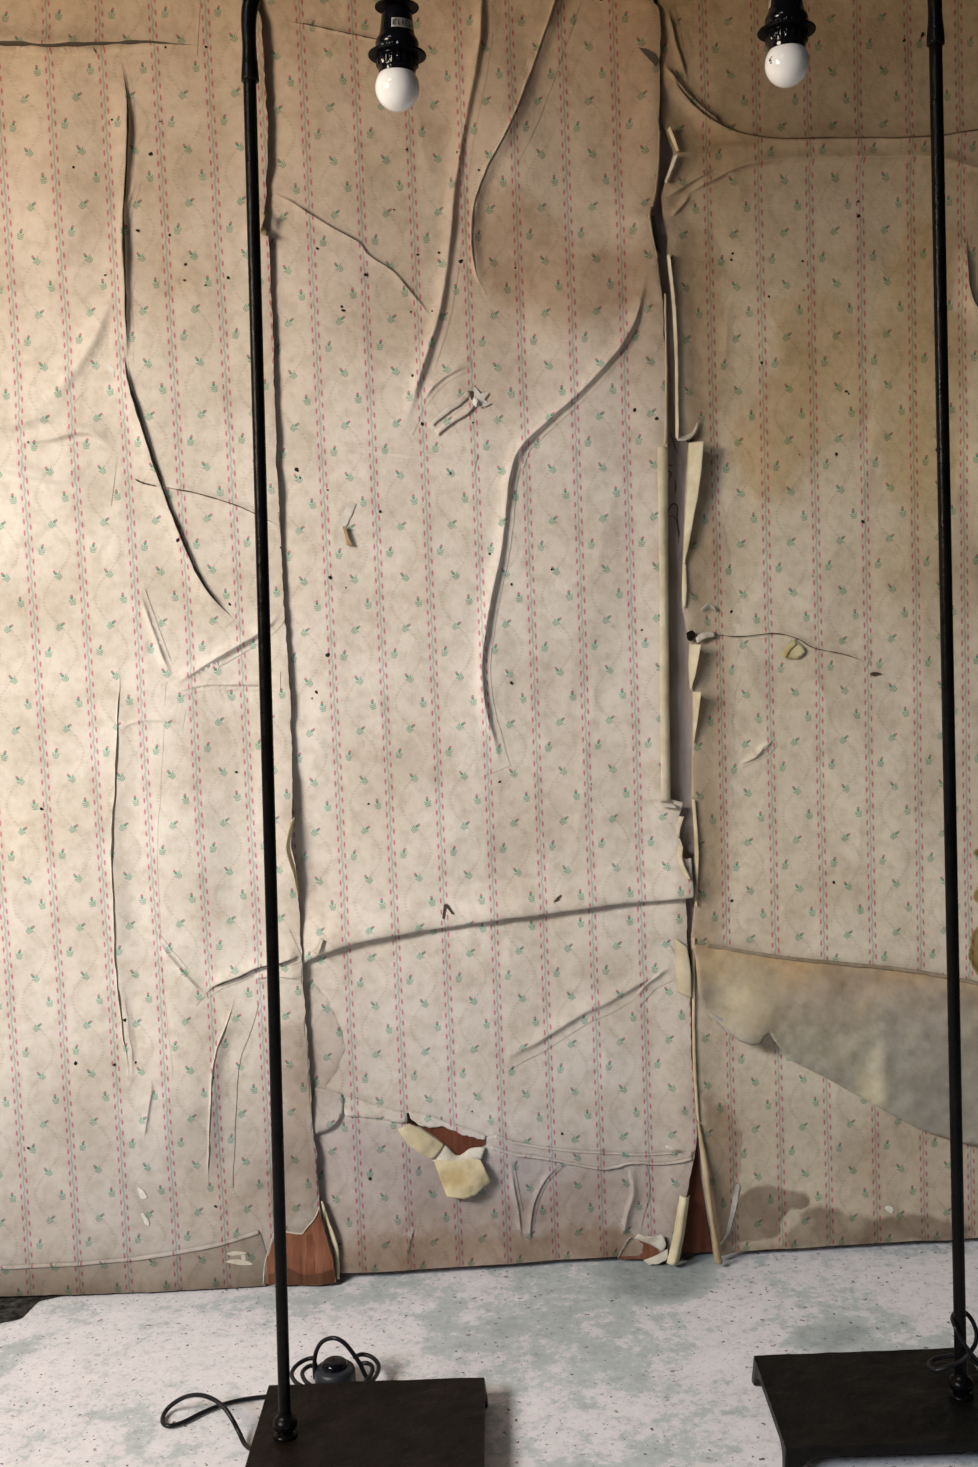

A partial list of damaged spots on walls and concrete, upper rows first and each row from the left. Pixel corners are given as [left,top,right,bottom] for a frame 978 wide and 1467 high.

peeling [639,47,658,66]
peeling [647,127,717,907]
spalling [398,1113,491,1199]
peeling [595,937,978,1308]
peeling [226,1200,340,1285]
peeling [442,1304,672,1432]
peeling [770,1322,871,1353]